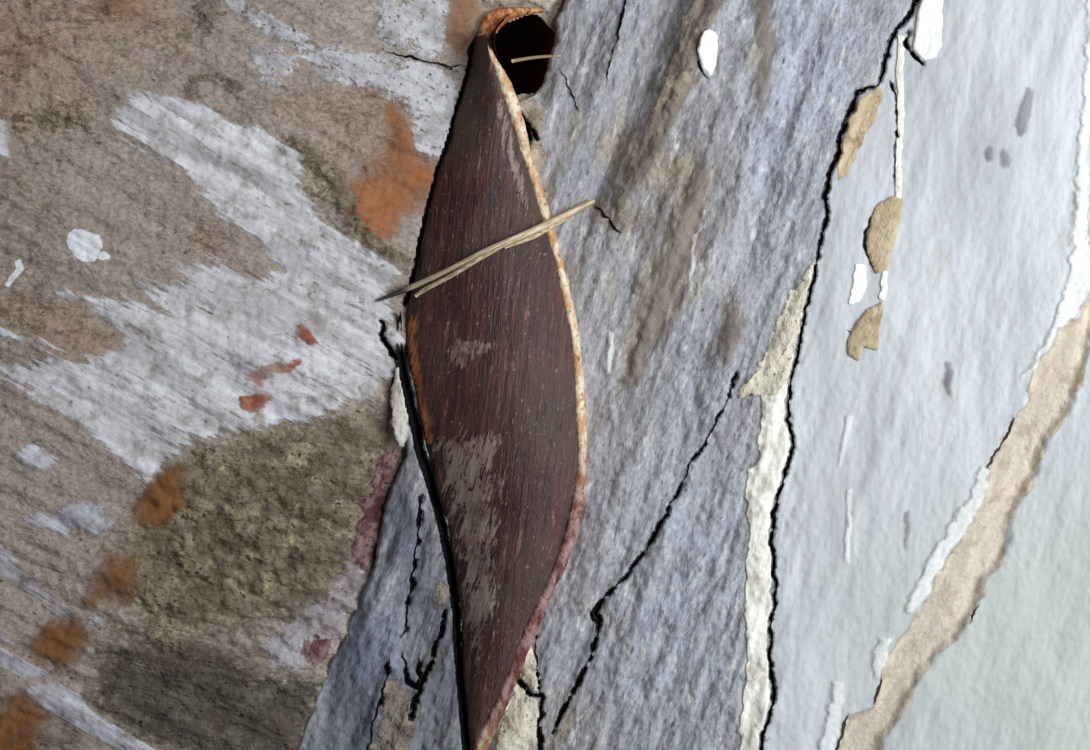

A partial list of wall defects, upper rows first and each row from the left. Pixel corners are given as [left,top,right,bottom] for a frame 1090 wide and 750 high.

rust [351,105,434,237]
rust [137,467,184,528]
rust [240,359,302,412]
rust [296,325,318,345]
crack [367,44,474,750]
crack [517,374,737,750]
peeling [737,260,816,750]
crack [760,0,924,750]
spalling [819,0,1090,750]
crack [986,419,1014,481]
rust [32,620,86,662]
rust [0,694,50,750]